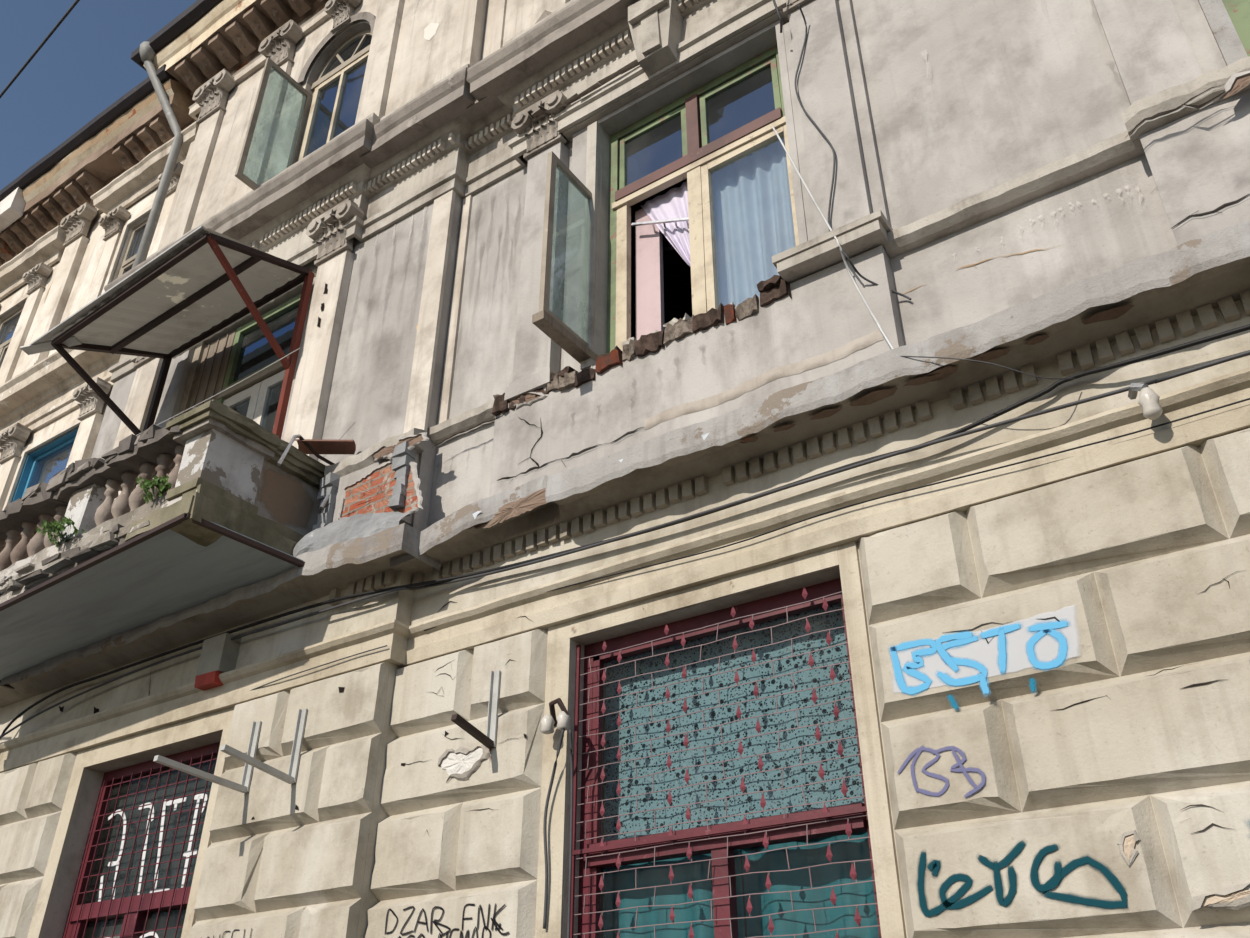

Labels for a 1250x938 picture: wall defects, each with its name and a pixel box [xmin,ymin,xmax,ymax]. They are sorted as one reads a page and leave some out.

crack [1125,83,1226,138]
crack [1172,194,1250,230]
crack [434,412,643,483]
flaking render [338,432,429,520]
flaking render [468,488,549,529]
flaking render [438,744,491,783]
flaking render [1117,830,1140,868]
flaking render [1190,883,1250,912]